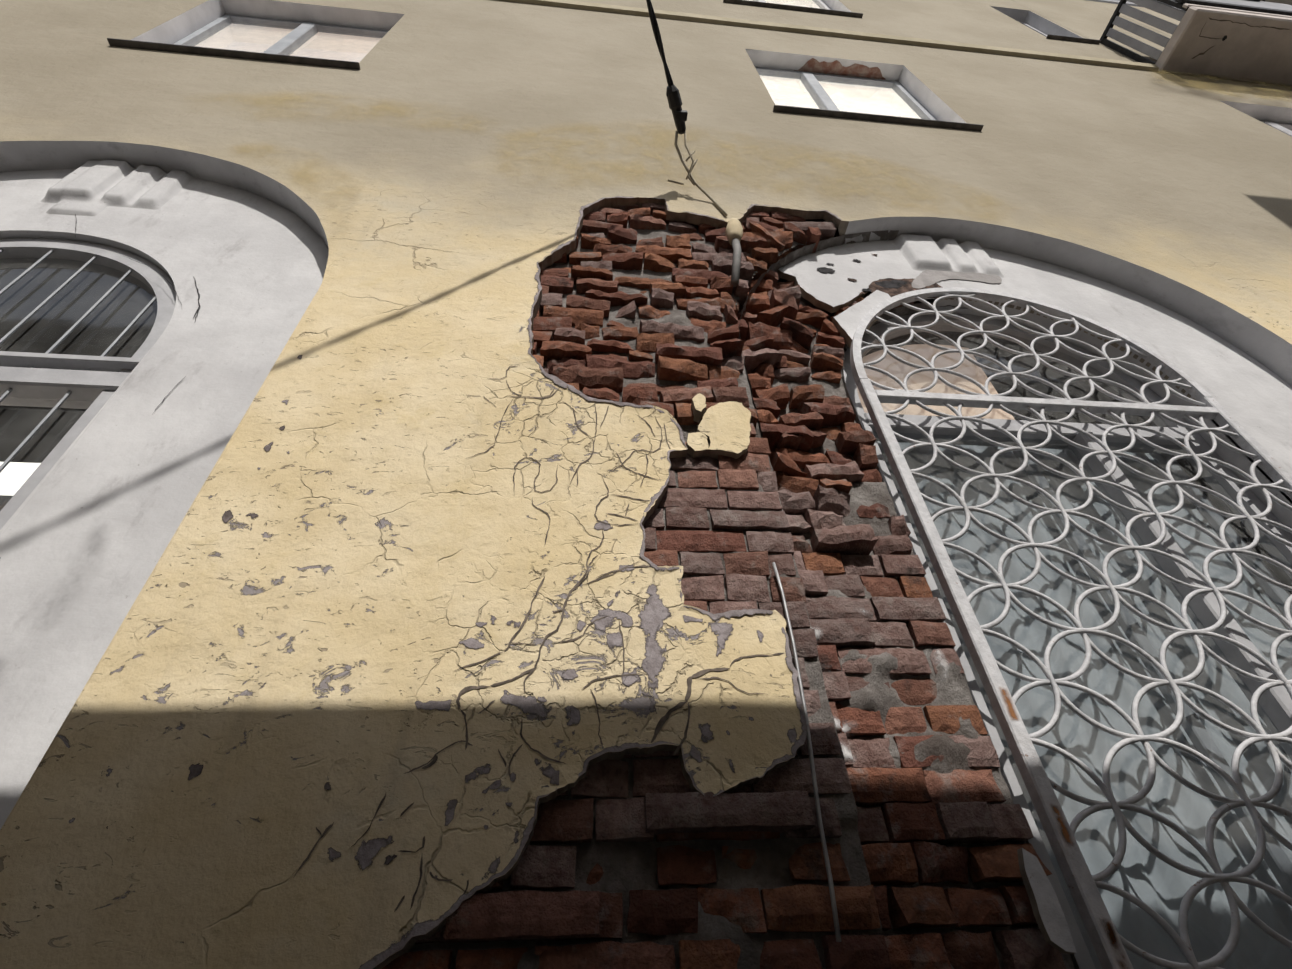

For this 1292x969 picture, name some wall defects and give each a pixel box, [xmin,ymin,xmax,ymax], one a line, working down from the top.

crack [1192,18,1290,59]
peeling [222,510,259,523]
spalling [359,196,1075,969]
crack [294,366,671,912]
crack [651,653,784,756]
corrosion [1002,689,1018,719]
peeling [187,763,203,780]
corrosion [1051,805,1073,844]
peeling [327,835,397,871]
corrosion [1106,921,1116,945]